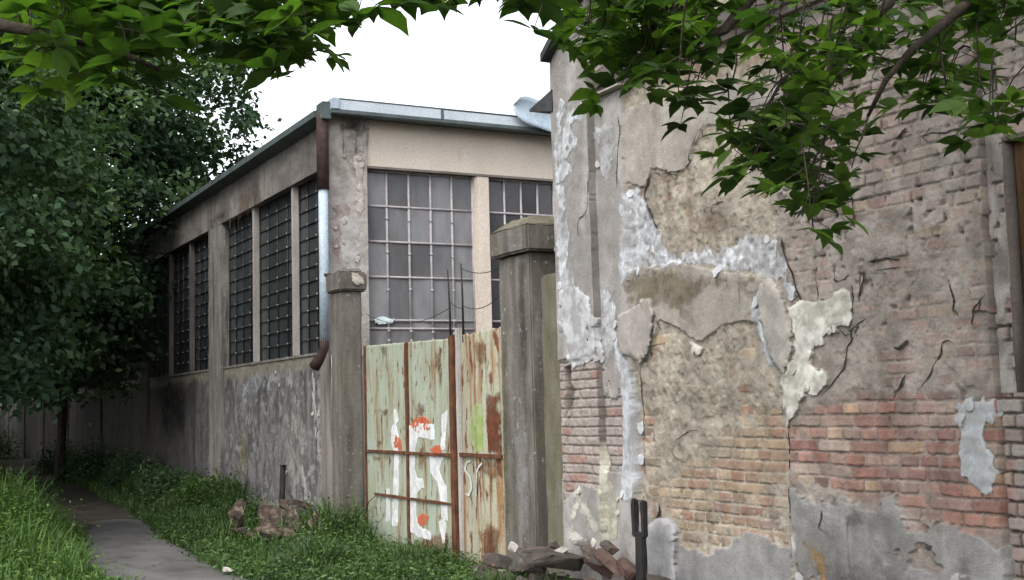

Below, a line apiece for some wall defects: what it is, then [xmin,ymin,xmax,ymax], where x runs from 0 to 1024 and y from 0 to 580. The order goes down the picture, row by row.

peeling [332,131,364,285]
flaking render [554,98,1013,580]
crack [780,236,901,396]
crack [894,285,989,397]
rust [480,393,502,493]
rust [415,534,448,552]
rust [480,525,499,554]